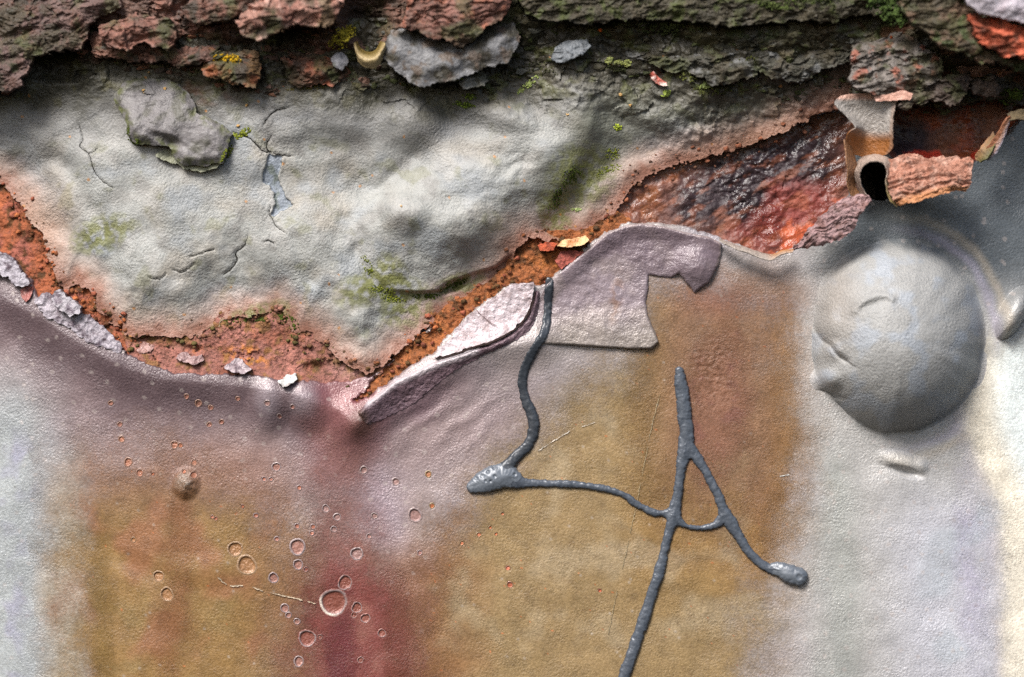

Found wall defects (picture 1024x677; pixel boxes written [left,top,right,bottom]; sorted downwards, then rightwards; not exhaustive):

crack [79,125,113,188]
crack [238,109,289,157]
rust [0,107,855,401]
peeling [0,0,1024,427]